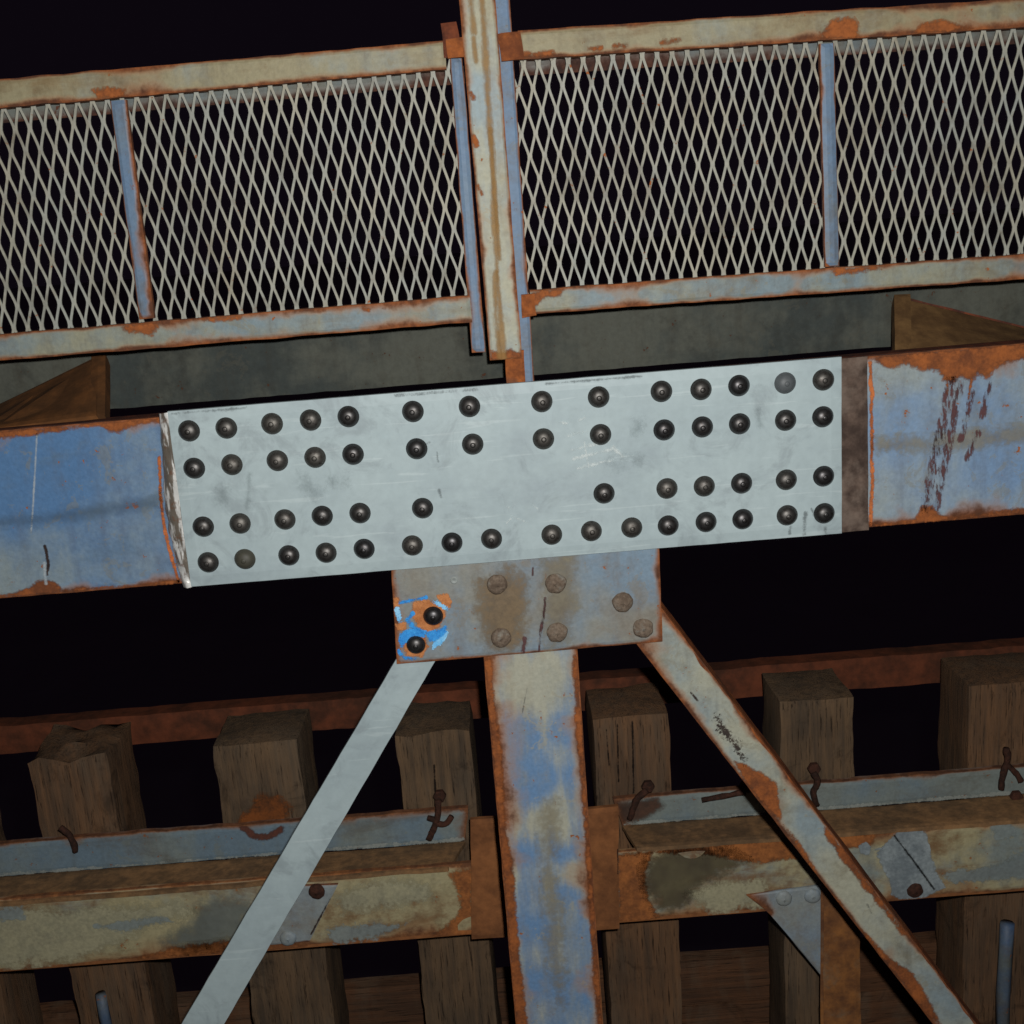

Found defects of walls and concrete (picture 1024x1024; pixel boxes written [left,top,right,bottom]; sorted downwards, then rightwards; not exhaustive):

rust [819,16,859,38]
rust [469,0,521,359]
rust [868,345,1024,526]
rust [0,580,135,598]
peeling [393,593,452,661]
rust [713,714,782,819]
rust [485,659,528,1024]
rust [572,656,602,1024]
rust [618,834,816,921]
rust [824,827,907,935]
rust [138,940,230,959]
rust [864,933,939,1024]